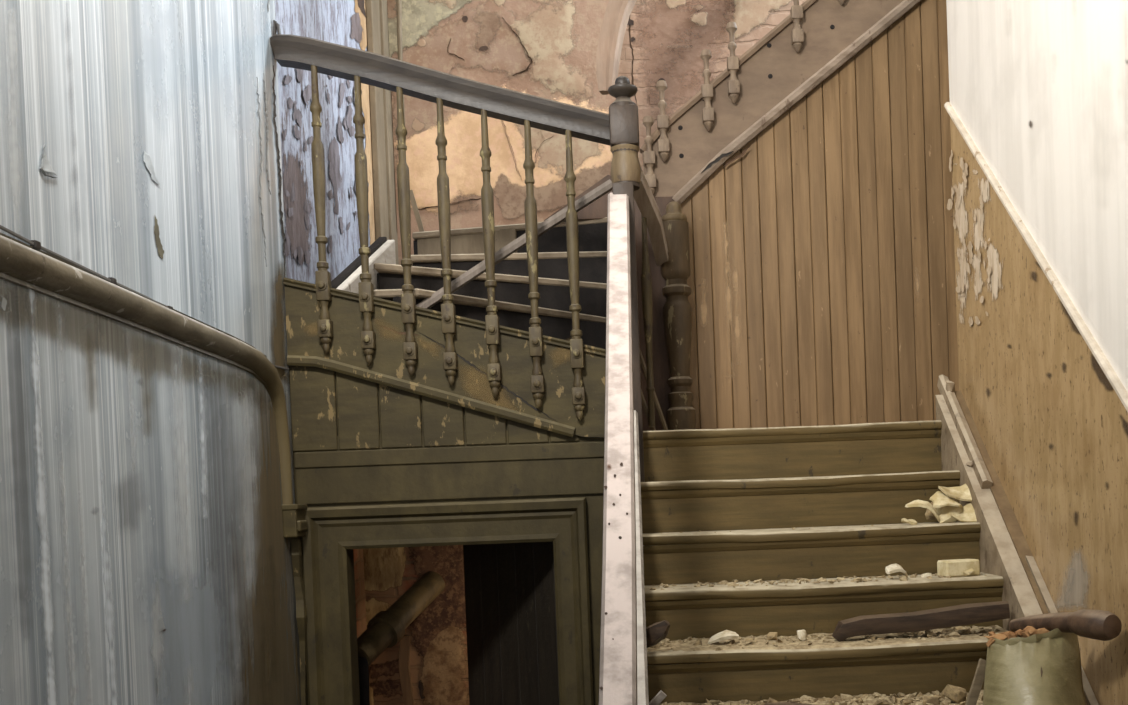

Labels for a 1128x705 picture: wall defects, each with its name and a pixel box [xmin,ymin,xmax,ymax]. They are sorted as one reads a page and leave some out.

peeling [350,0,368,51]
peeling [387,0,609,114]
spalling [627,0,792,117]
peeling [282,69,313,266]
peeling [326,75,376,253]
peeling [392,91,613,219]
peeling [947,150,1003,327]